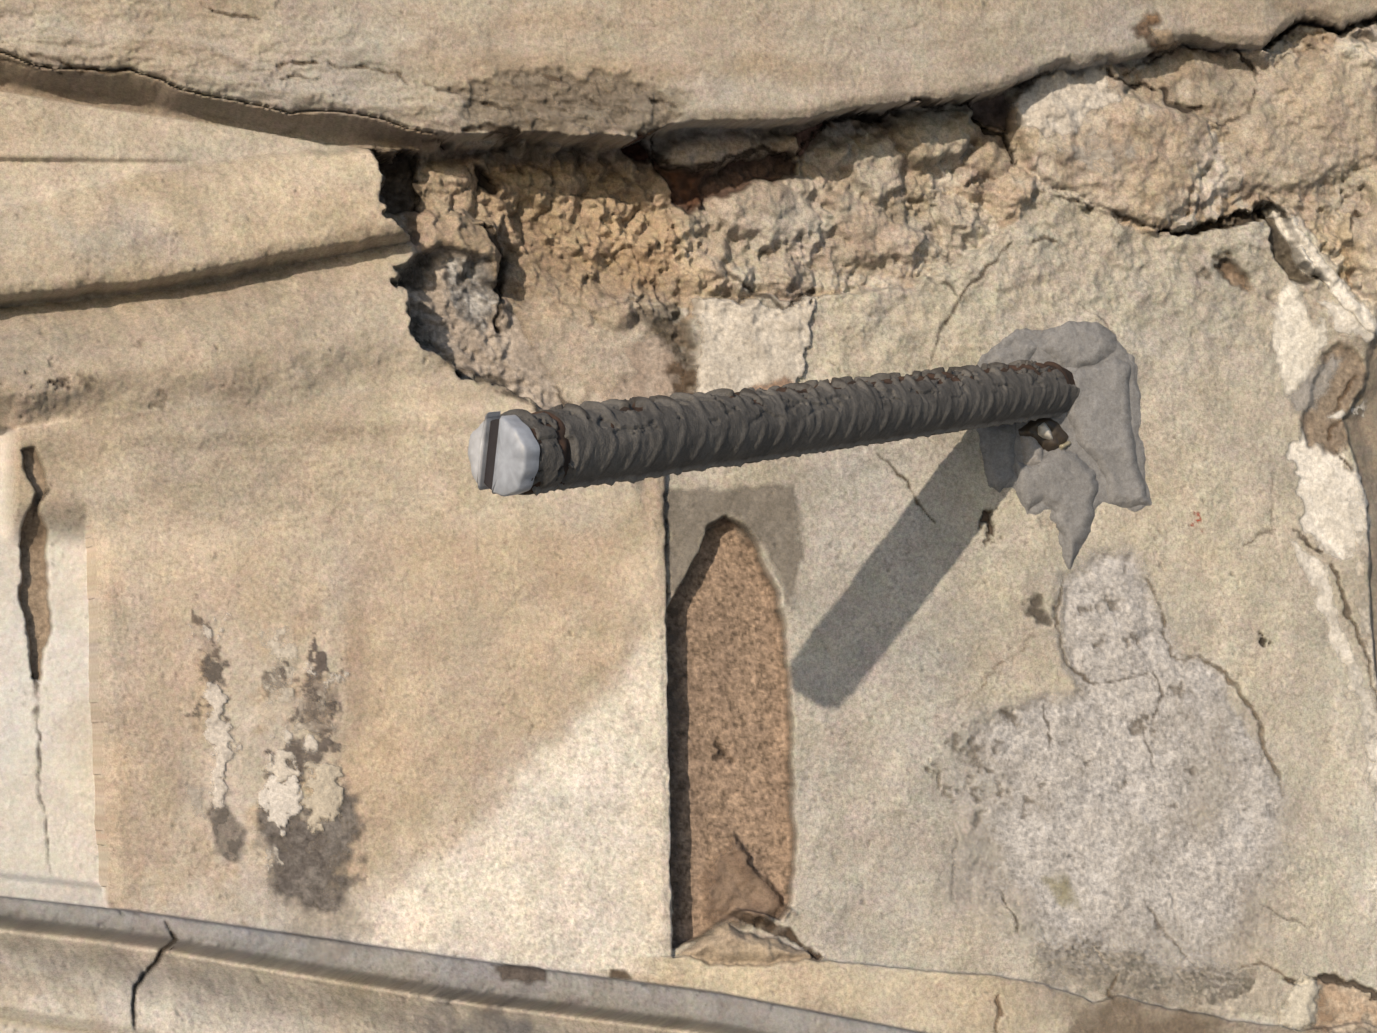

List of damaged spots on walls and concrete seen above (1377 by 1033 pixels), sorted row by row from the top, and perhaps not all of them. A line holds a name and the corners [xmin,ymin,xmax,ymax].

spalling [370,149,421,214]
spalling [436,70,825,215]
crack [823,72,1051,164]
spalling [1011,57,1133,171]
crack [1106,14,1377,126]
spalling [398,247,567,412]
spalling [607,335,680,400]
spalling [690,274,816,393]
spalling [663,486,802,947]
crack [132,931,177,1026]